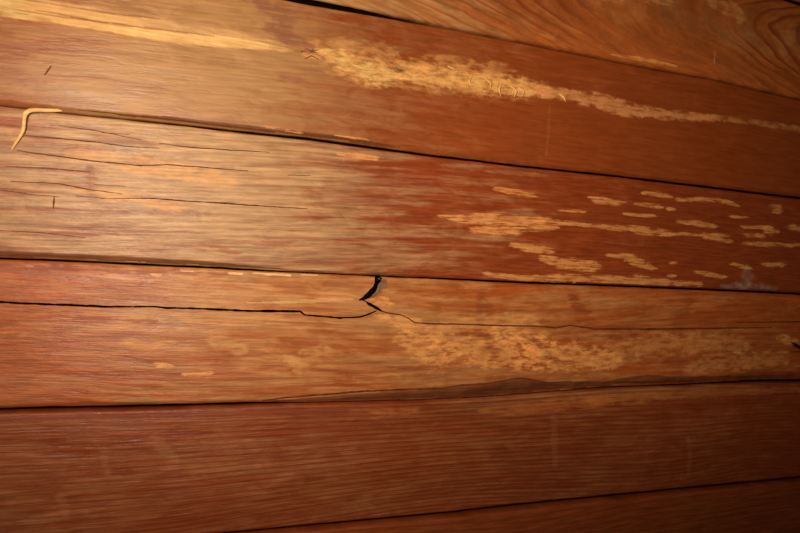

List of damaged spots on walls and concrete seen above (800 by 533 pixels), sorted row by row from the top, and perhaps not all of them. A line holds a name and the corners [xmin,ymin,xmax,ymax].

crack [0,276,799,330]